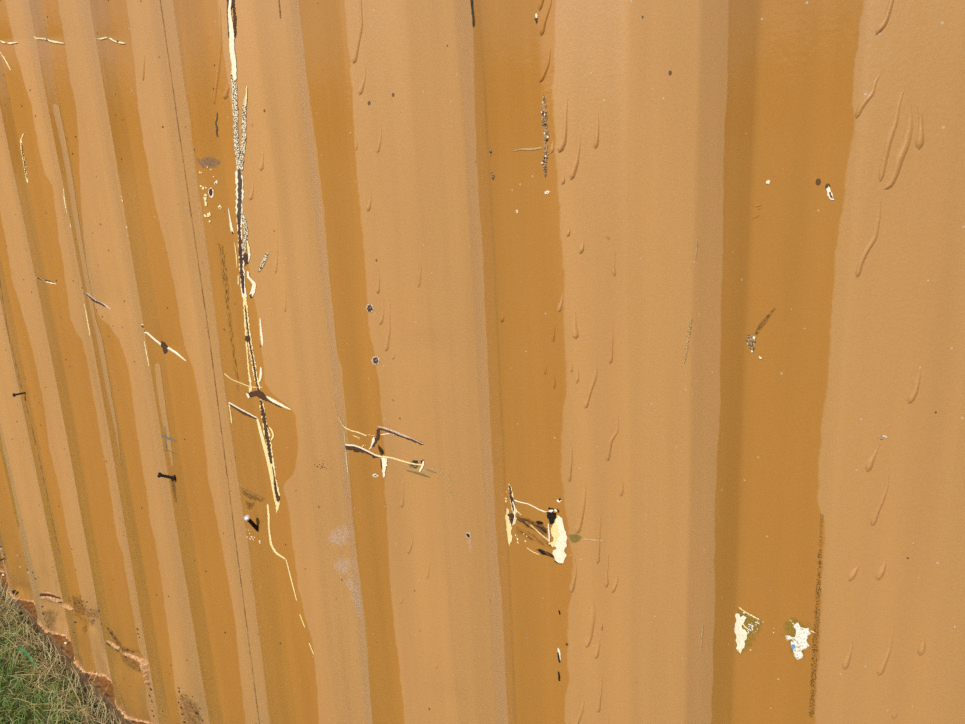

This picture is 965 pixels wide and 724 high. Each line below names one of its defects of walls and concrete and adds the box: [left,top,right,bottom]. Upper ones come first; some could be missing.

peeling [247,253,268,298]
spalling [338,417,440,478]
peeling [505,484,567,564]
peeling [734,607,761,654]
peeling [785,620,815,660]